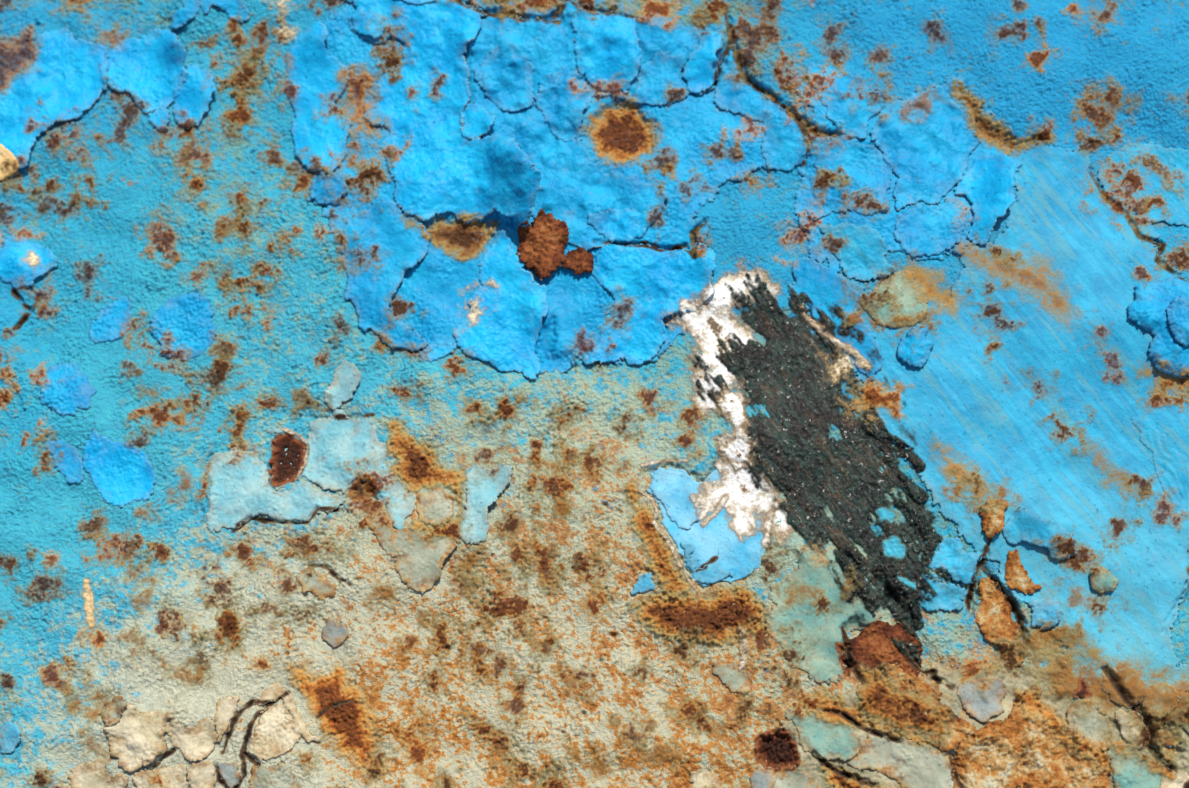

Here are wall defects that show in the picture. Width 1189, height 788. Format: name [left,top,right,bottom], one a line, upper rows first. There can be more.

peeling [0,0,250,180]
rust [639,0,931,151]
crack [1090,172,1186,281]
peeling [285,0,1189,788]
leakage [800,306,872,370]
rust [77,388,614,697]
peeling [205,360,514,594]
leakage [835,538,927,668]
rust [611,459,1189,788]
leakage [862,419,942,566]
crack [153,748,176,768]
crack [215,691,290,788]